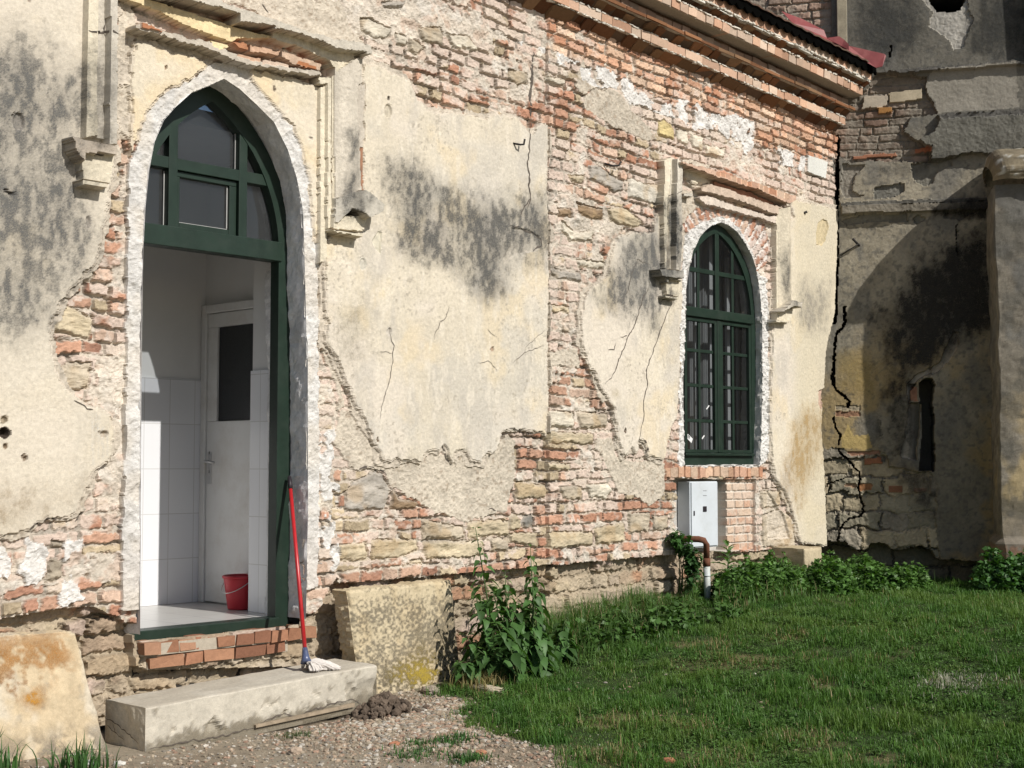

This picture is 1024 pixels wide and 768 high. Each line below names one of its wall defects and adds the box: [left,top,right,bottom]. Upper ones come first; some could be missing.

leakage [0,0,385,326]
leakage [387,164,549,298]
spalling [0,0,956,623]
crack [512,53,542,251]
crack [609,259,674,453]
crack [824,133,866,540]
leakage [869,197,990,454]
spalling [924,0,974,50]